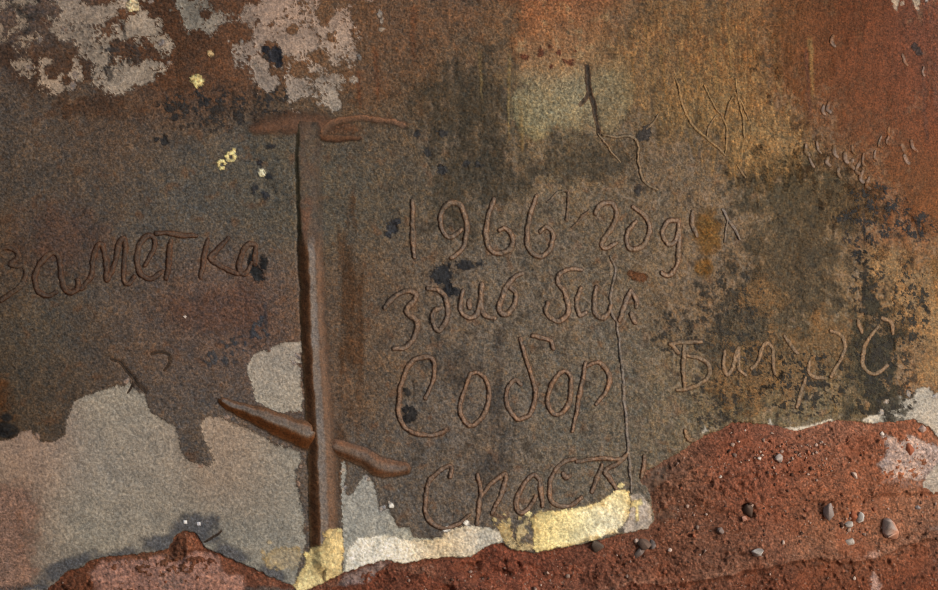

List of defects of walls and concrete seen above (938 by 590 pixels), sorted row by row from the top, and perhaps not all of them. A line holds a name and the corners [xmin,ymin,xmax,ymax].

peeling [0,0,176,96]
peeling [175,0,368,113]
crack [578,64,659,191]
leakage [422,0,938,433]
rust [773,0,938,232]
peeling [0,378,307,590]
peeling [247,341,304,413]
crack [609,256,633,494]
spalling [309,373,938,590]